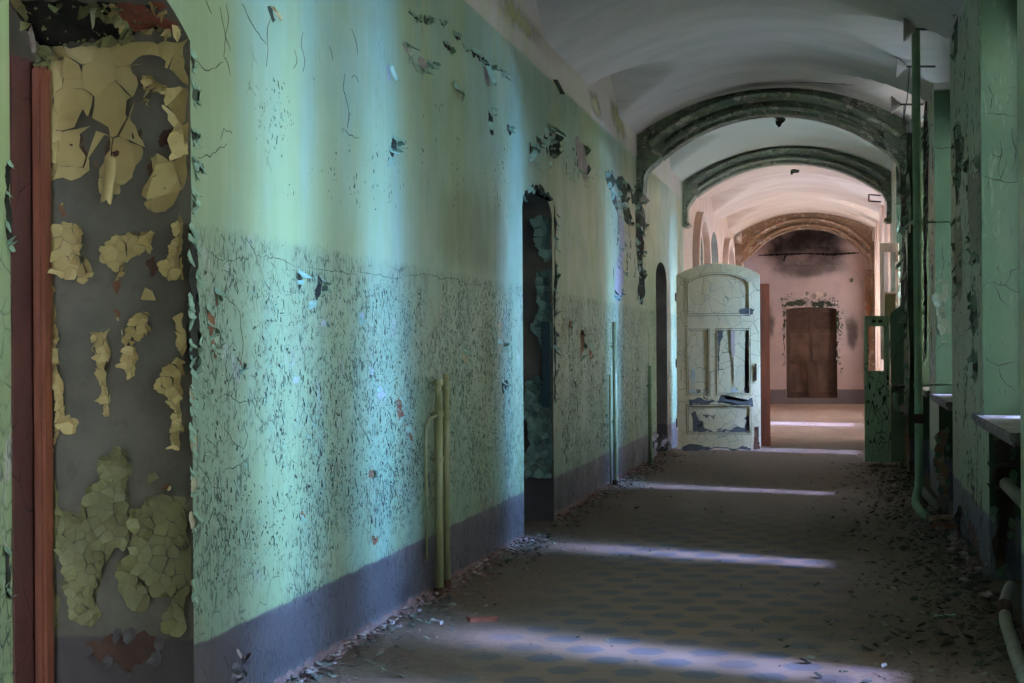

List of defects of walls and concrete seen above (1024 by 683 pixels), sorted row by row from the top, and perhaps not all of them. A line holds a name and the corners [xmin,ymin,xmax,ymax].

crack [195,1,272,75]
crack [329,31,359,138]
peeling [408,0,512,87]
crack [982,85,1018,183]
peeling [529,123,649,307]
water stain [769,229,842,276]
peeling [11,0,228,679]
peeling [501,184,640,479]
peeling [689,331,753,432]
peeling [780,291,843,375]
water stain [847,320,857,347]
peeling [214,269,424,597]